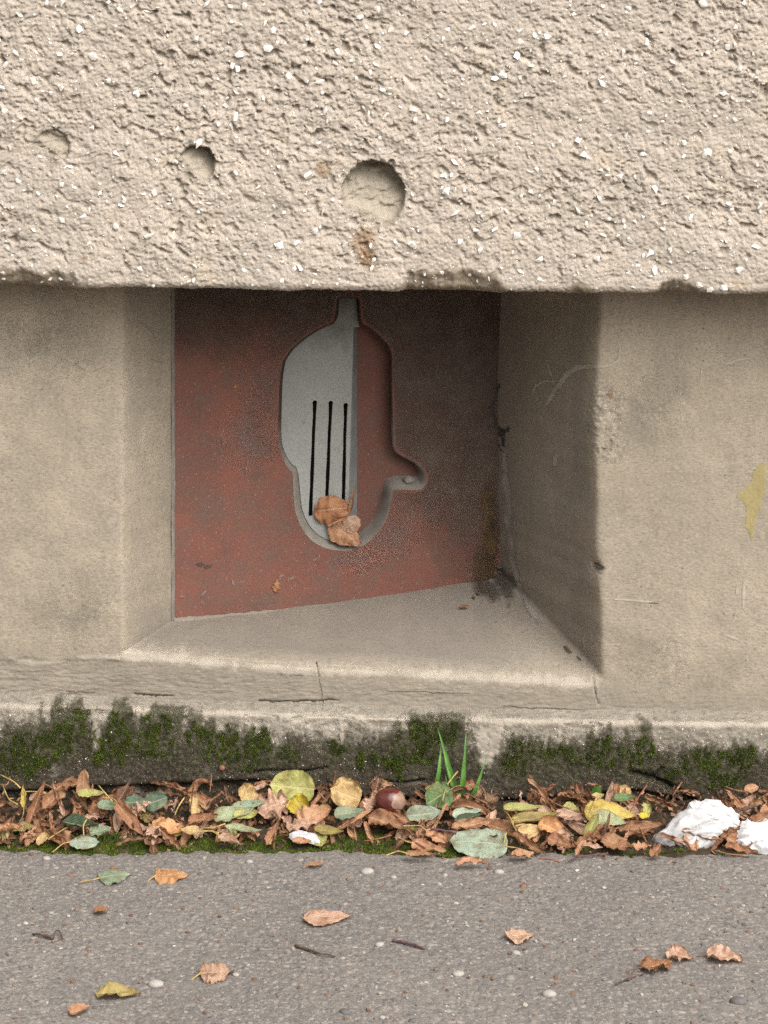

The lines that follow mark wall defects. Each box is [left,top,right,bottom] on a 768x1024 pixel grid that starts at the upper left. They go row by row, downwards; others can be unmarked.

spalling [0,0,768,293]
crack [260,661,333,703]
leakage [0,693,768,801]